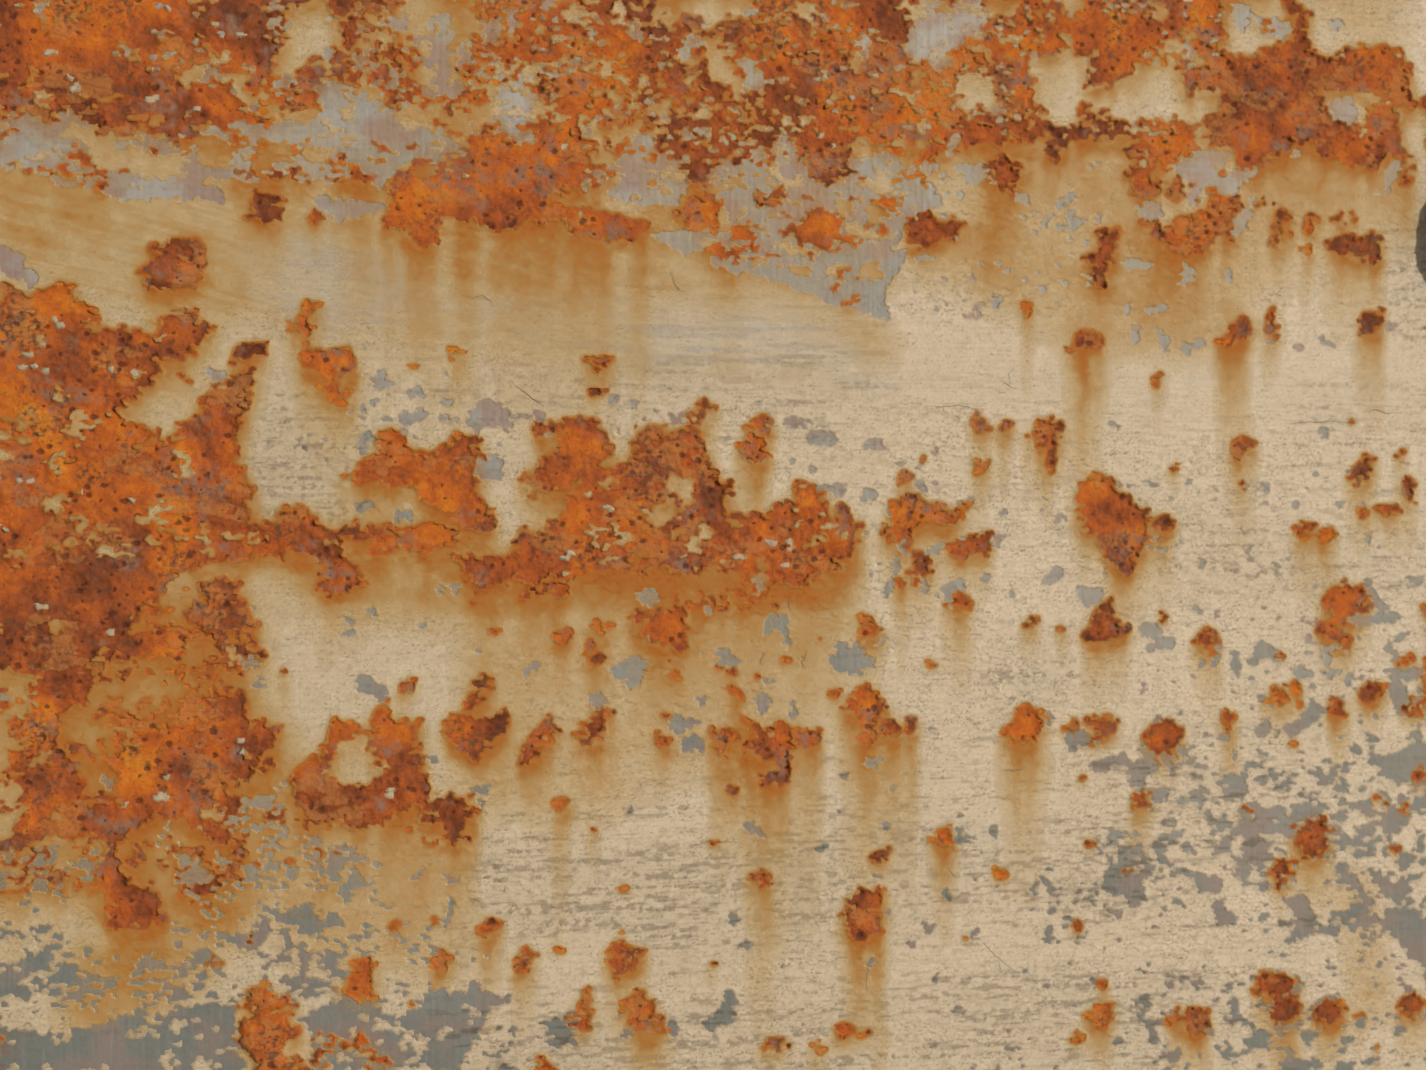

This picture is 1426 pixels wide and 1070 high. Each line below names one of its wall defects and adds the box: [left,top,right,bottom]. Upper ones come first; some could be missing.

peeling [0,0,611,222]
peeling [951,62,1021,135]
corrosion [0,0,1426,415]
peeling [0,246,38,289]
corrosion [969,410,1066,482]
corrosion [0,221,995,1025]
corrosion [1021,471,1177,661]
corrosion [1313,578,1375,658]
peeling [953,813,997,844]
peeling [0,782,585,1070]
peeling [906,922,937,948]
corrosion [232,955,393,1070]